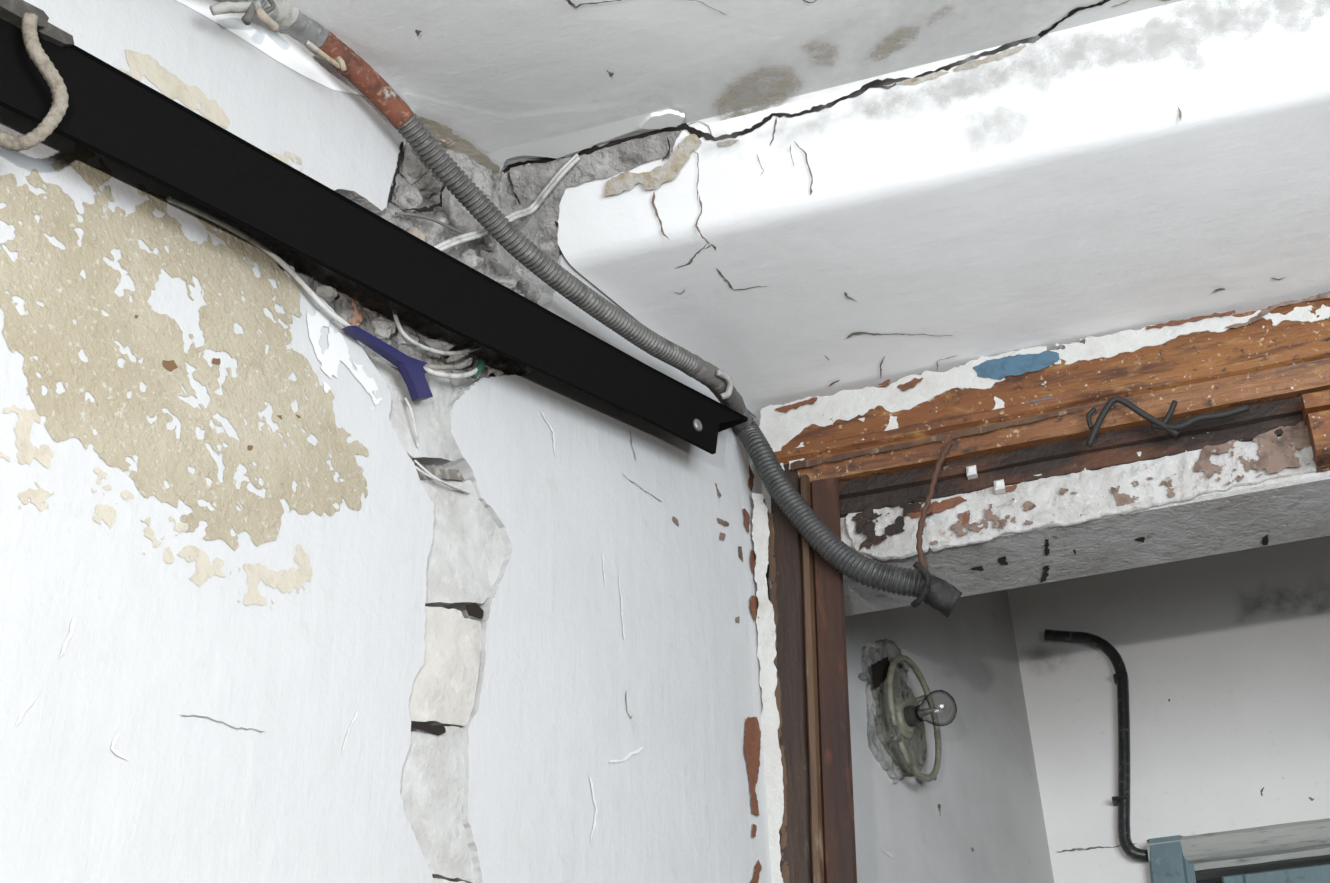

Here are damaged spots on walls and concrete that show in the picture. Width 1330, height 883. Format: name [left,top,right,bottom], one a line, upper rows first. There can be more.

peeling [406,95,739,262]
crack [503,0,1169,294]
peeling [0,141,546,883]
peeling [759,291,1330,470]
spalling [840,421,1329,561]
peeling [717,464,790,883]